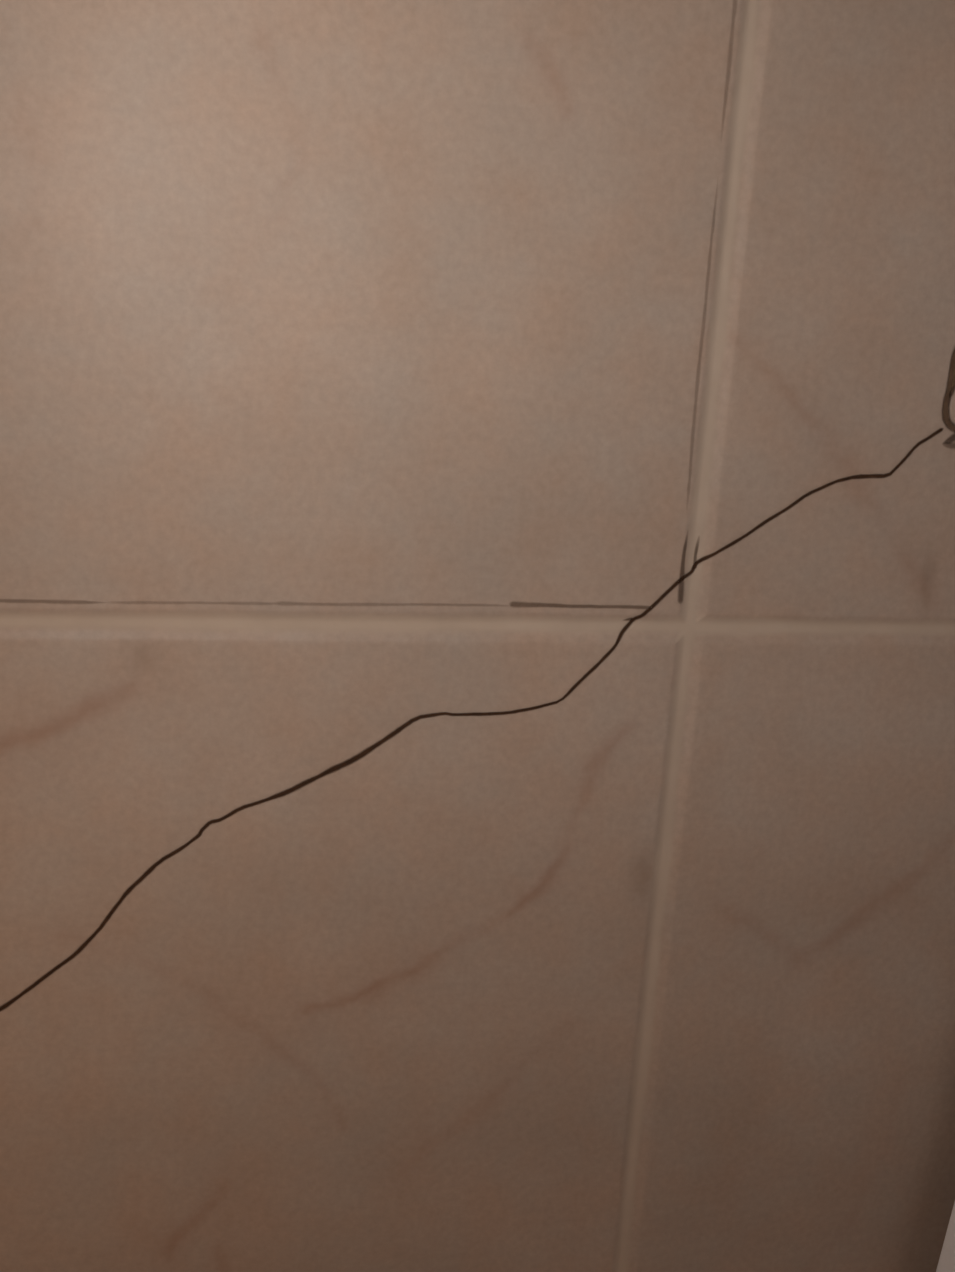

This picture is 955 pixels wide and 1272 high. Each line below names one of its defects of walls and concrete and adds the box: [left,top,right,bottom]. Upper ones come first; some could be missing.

crack [0,428,943,1011]